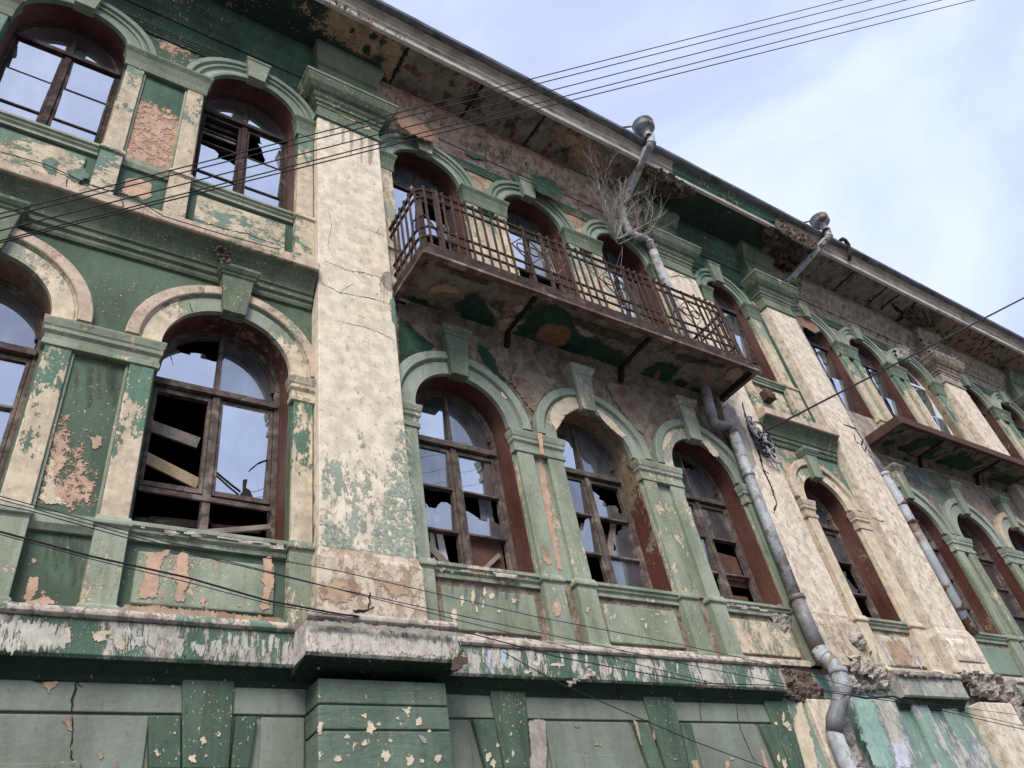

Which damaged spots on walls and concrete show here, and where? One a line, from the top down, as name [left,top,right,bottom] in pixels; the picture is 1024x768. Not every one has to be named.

peeling [130,101,177,170]
spalling [122,178,152,200]
crack [322,210,388,304]
spalling [761,219,817,272]
peeling [407,283,628,367]
peeling [39,413,102,513]
peeling [318,415,426,559]
peeling [123,530,284,622]
crack [32,680,82,761]
peeling [344,713,381,747]
peeling [406,755,441,766]
peeling [842,630,1024,768]